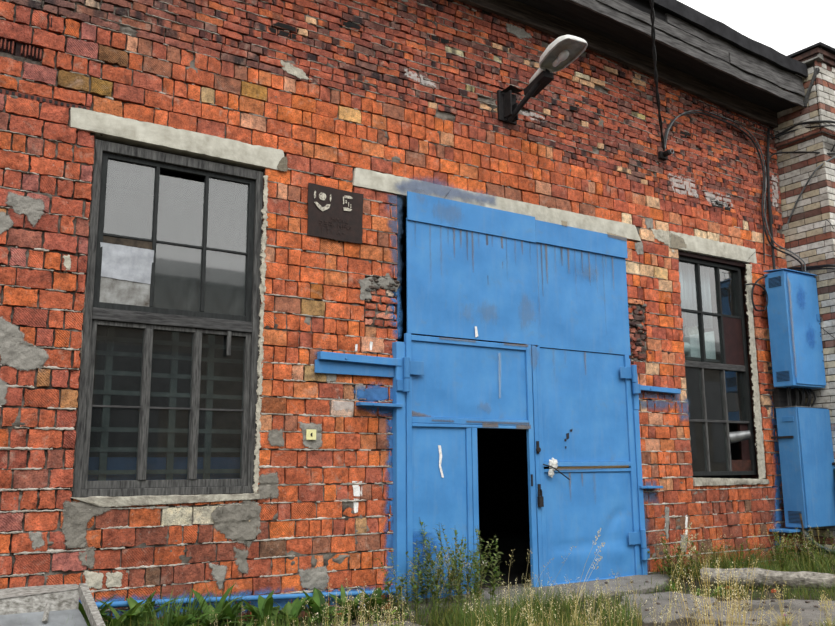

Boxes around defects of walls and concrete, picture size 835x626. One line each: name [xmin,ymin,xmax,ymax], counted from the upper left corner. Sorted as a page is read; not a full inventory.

spalling [365,275,399,292]